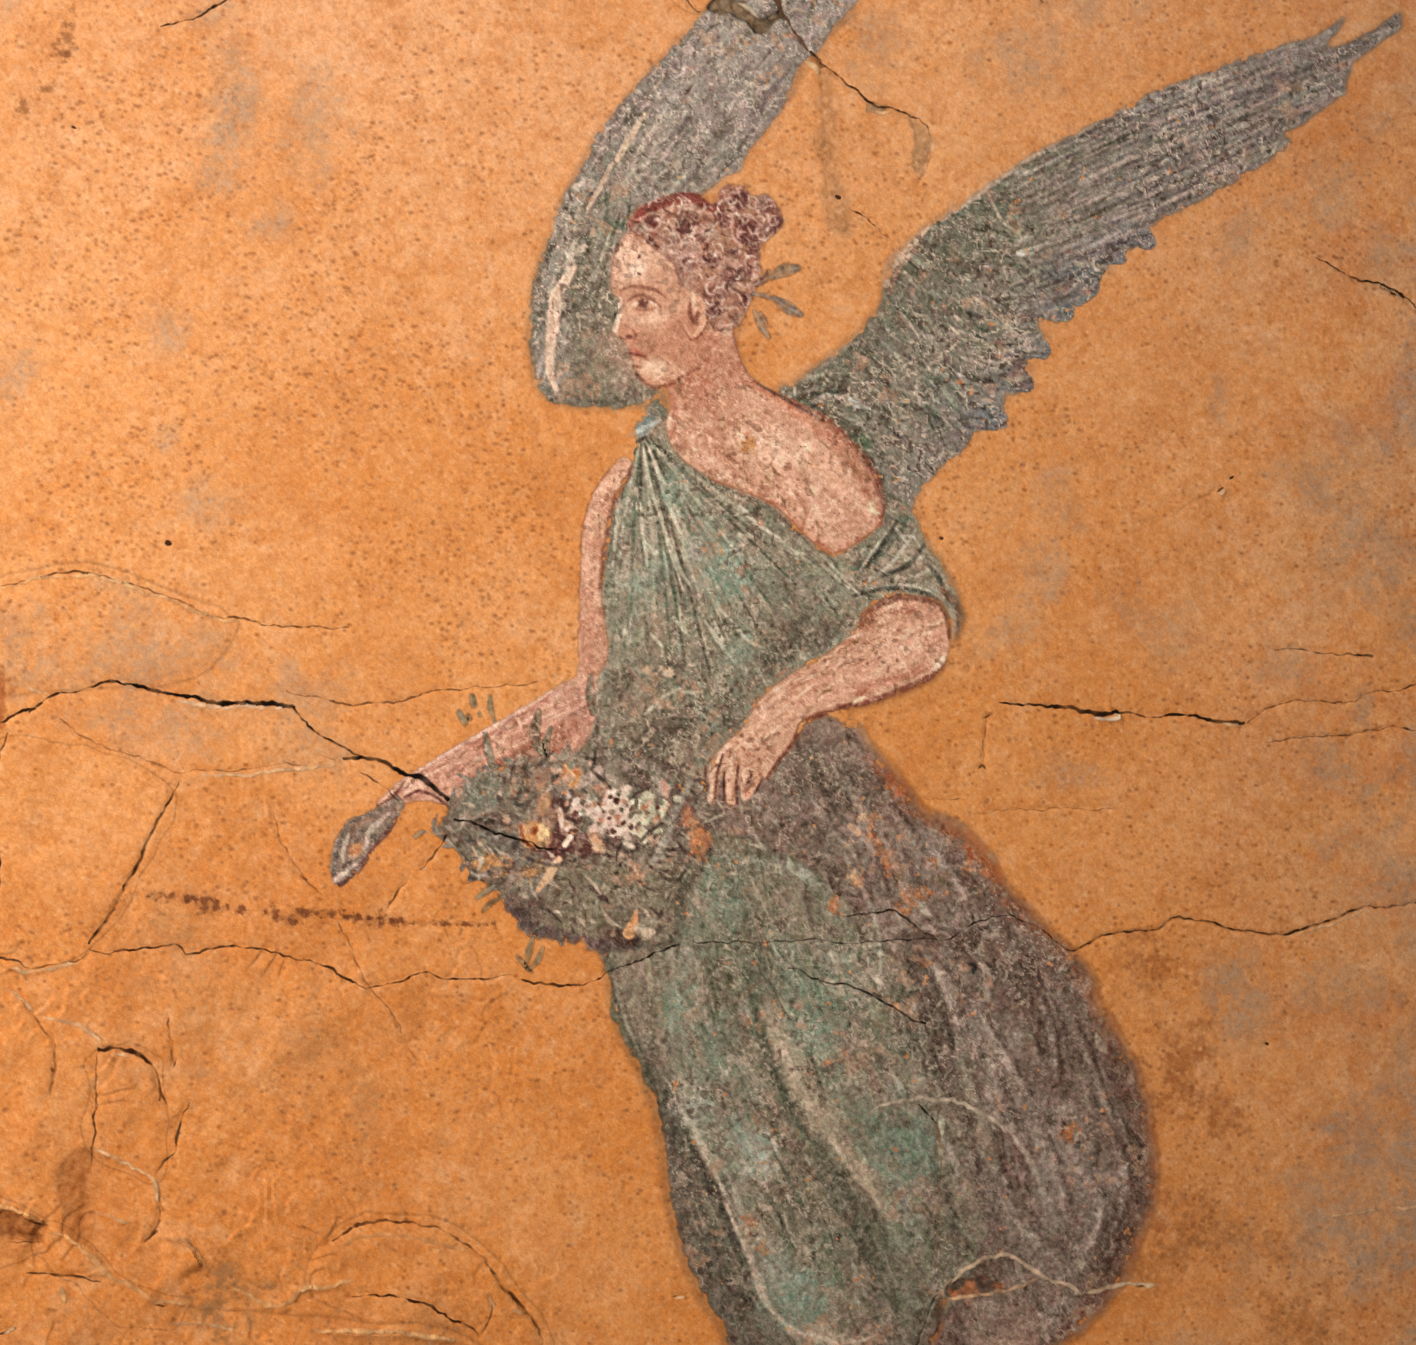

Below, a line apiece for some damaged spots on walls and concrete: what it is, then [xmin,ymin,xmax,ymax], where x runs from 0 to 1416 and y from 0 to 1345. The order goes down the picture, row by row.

crack [741,0,928,128]
crack [1324,261,1416,308]
crack [13,570,317,628]
crack [985,702,1274,726]
crack [1,680,554,902]
crack [0,793,1376,1263]
crack [0,1204,223,1328]
crack [237,1219,540,1342]
crack [915,1253,1154,1345]